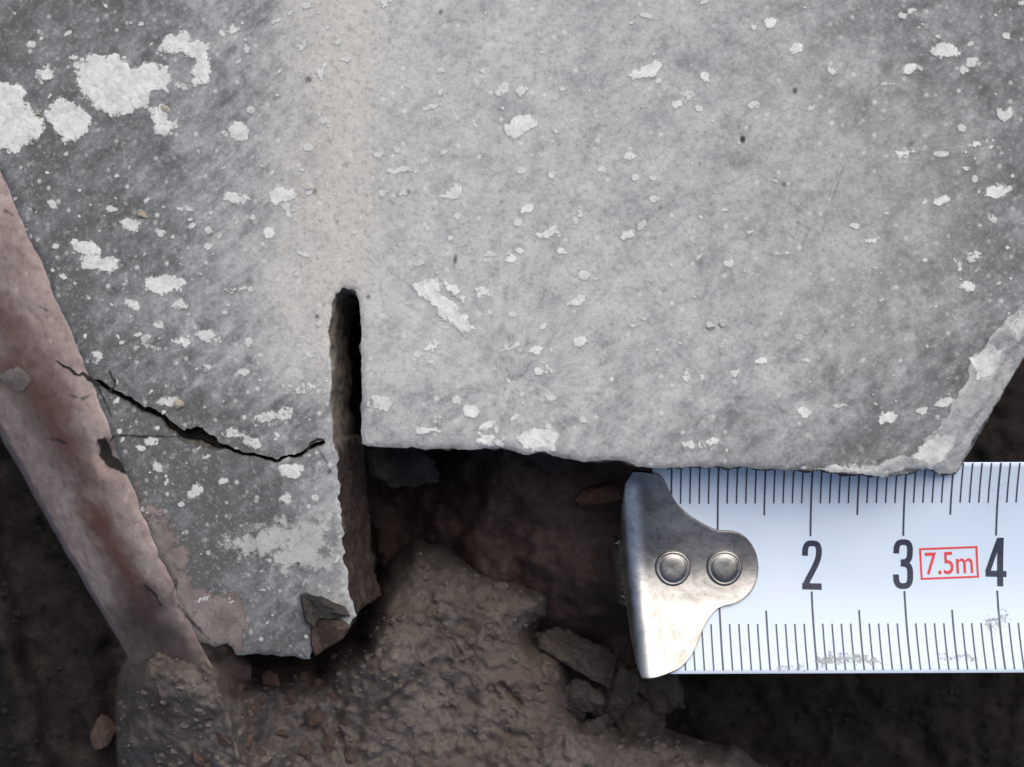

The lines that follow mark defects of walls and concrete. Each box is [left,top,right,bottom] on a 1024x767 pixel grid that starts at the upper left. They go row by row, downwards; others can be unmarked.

damp [0,20,244,155]
crack [56,360,325,463]